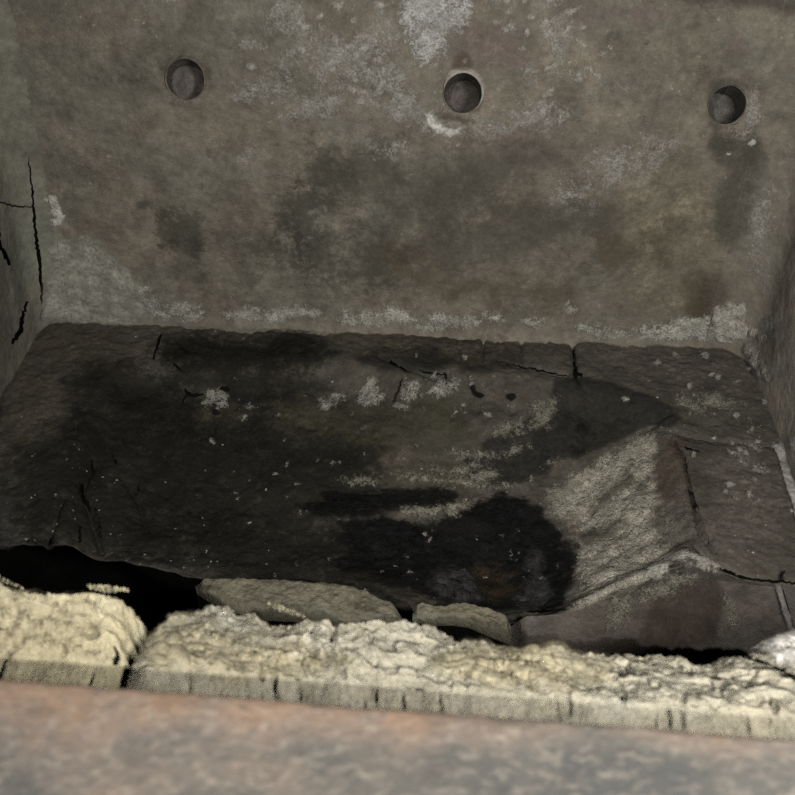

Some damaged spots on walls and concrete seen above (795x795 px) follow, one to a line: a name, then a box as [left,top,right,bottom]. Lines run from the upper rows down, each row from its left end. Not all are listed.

water stain [230,0,570,139]
crack [0,158,43,344]
crack [383,356,450,402]
water stain [482,400,557,437]
crack [482,346,583,379]
water stain [390,443,532,517]
water stain [547,431,719,630]
crack [671,436,712,547]